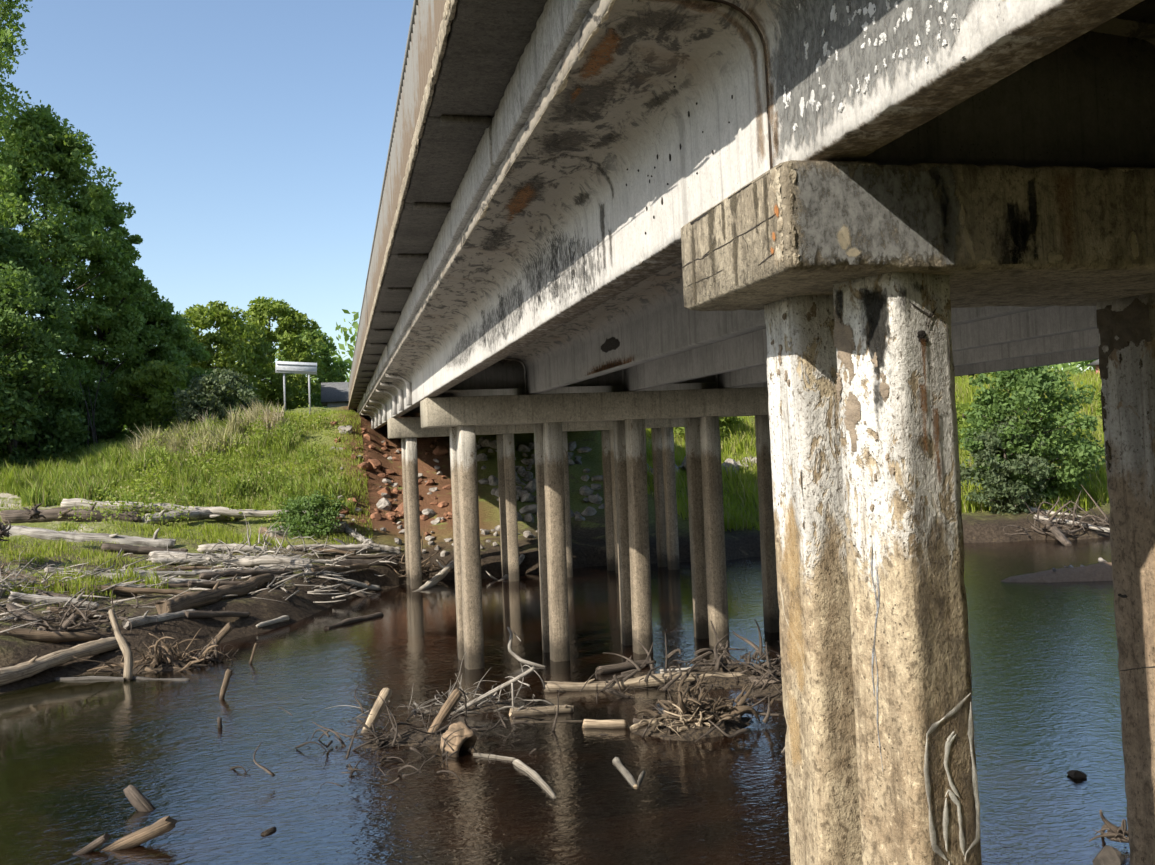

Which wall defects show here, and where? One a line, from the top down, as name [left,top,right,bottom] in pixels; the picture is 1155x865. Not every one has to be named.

water stain [646,89,678,109]
water stain [768,0,971,158]
water stain [443,62,650,368]
water stain [796,164,1063,265]
water stain [835,290,843,323]
water stain [859,283,924,412]
peeling [1096,298,1151,473]
crack [871,536,883,771]